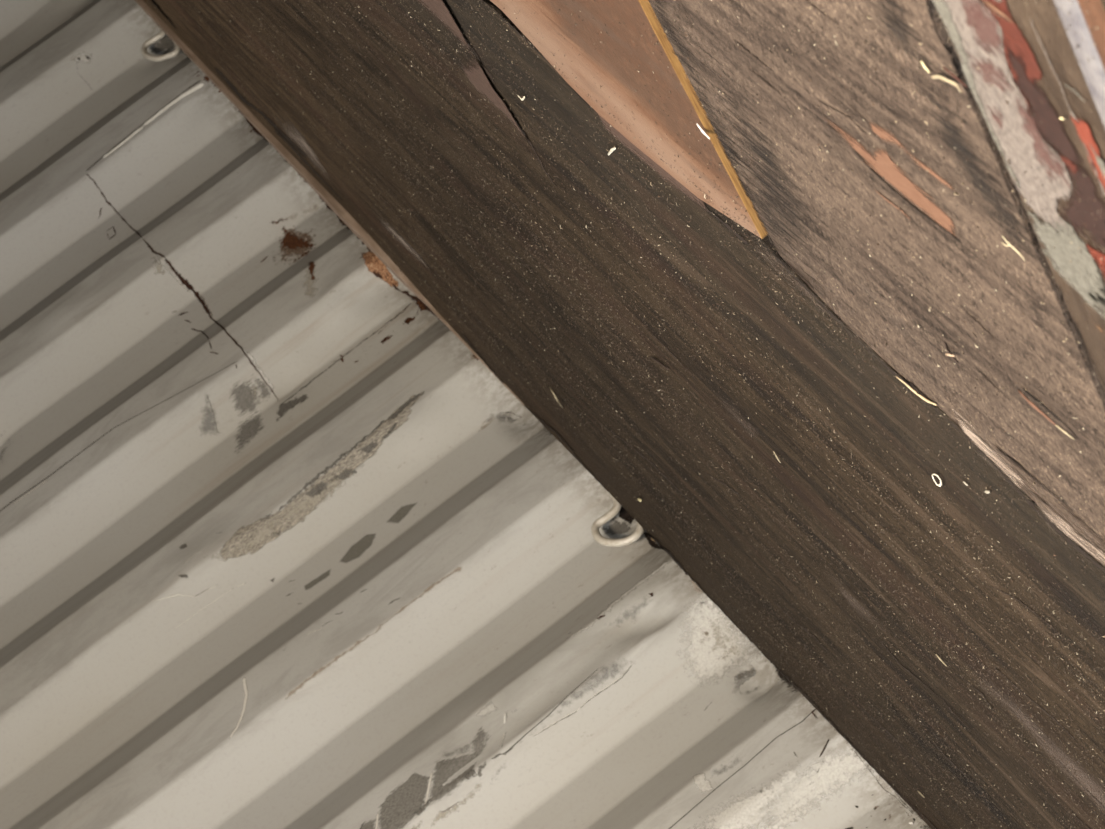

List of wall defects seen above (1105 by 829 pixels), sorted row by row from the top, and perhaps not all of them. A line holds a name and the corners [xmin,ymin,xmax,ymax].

crack [86,174,278,399]
rust [260,219,316,295]
peeling [217,392,424,560]
crack [463,335,504,384]
crack [419,0,564,189]
crack [527,408,605,488]
crack [733,39,780,94]
crack [598,108,1105,573]
crack [926,0,1105,396]
peeling [932,0,1105,318]
crack [642,528,936,829]